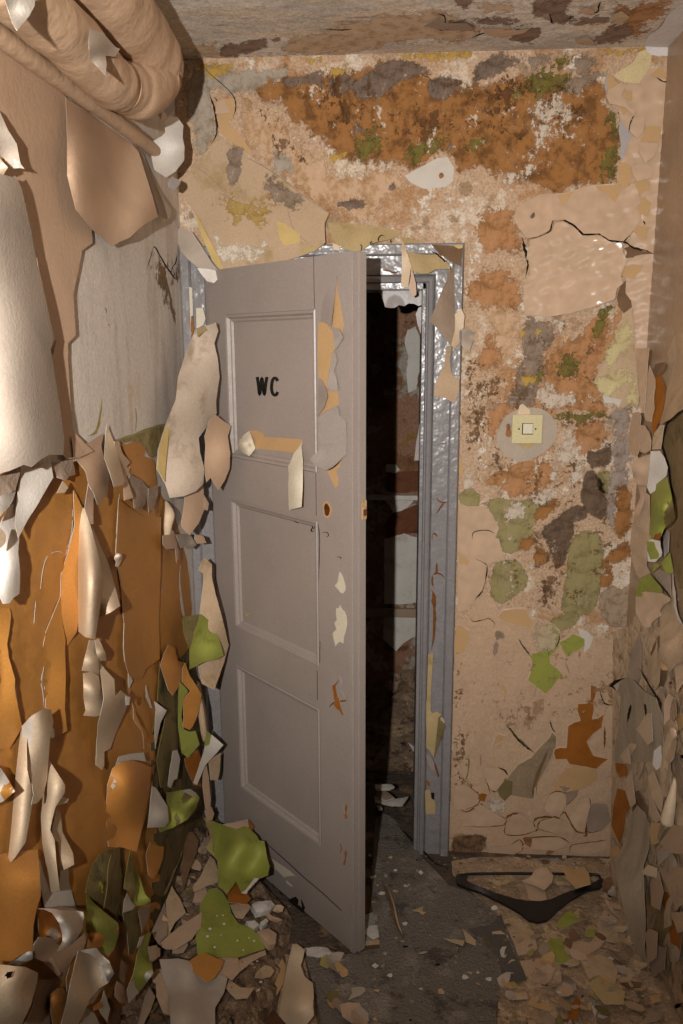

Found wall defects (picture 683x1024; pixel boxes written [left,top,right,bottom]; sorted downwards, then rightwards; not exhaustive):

peeling [5,0,35,31]
leakage [194,0,673,187]
leakage [337,198,366,211]
crack [522,220,653,313]
peeling [0,50,476,1024]
spalling [453,66,683,1016]
crack [464,754,509,791]
crack [507,726,533,752]